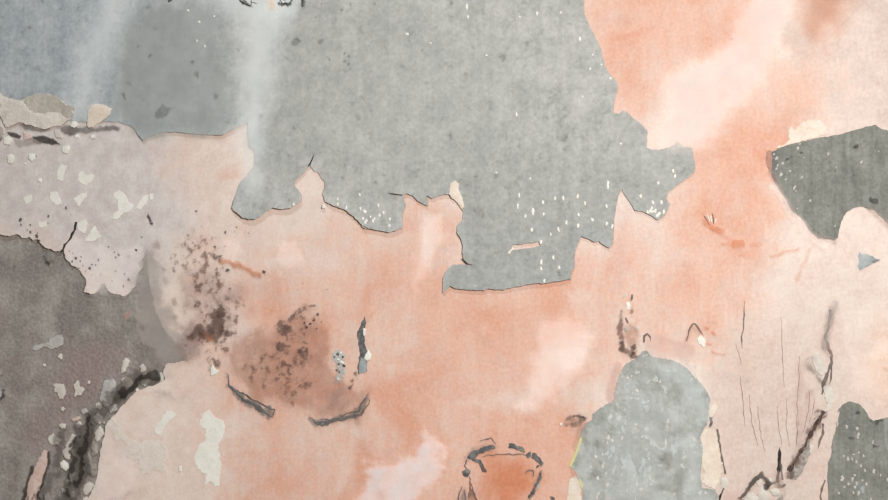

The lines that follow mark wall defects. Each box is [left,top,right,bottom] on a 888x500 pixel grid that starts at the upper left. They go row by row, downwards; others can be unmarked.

crack [278,0,305,8]
peeling [0,0,696,293]
flaking render [0,215,187,500]
water stain [138,235,275,418]
water stain [249,305,322,404]
water stain [332,317,371,389]
flaking render [617,293,651,358]
water stain [309,394,370,426]
peeling [194,410,225,486]
rust [458,437,543,500]
peeling [700,429,729,489]
flaking render [738,448,786,500]